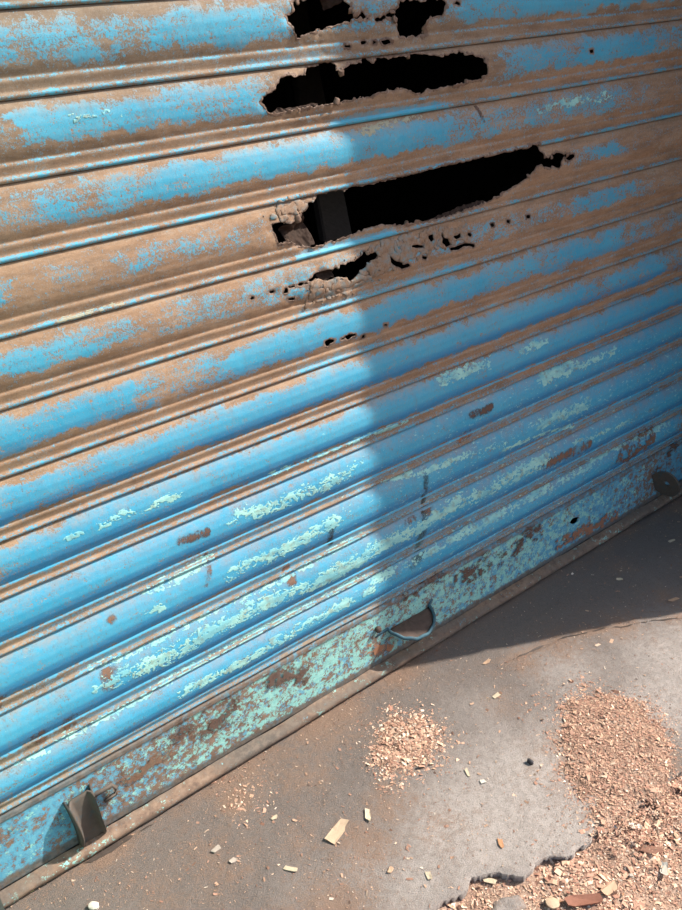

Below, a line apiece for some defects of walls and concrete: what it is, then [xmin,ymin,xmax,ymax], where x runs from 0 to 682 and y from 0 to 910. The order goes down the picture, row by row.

corrosion [263,194,314,222]
peeling [278,214,315,247]
peeling [315,269,334,280]
corrosion [304,220,471,309]
peeling [57,302,124,323]
peeling [537,346,617,386]
peeling [379,396,592,489]
peeling [14,417,670,767]
crack [514,618,679,659]
corrosion [100,666,115,690]
corrosion [265,664,311,691]
corrosion [106,695,240,796]